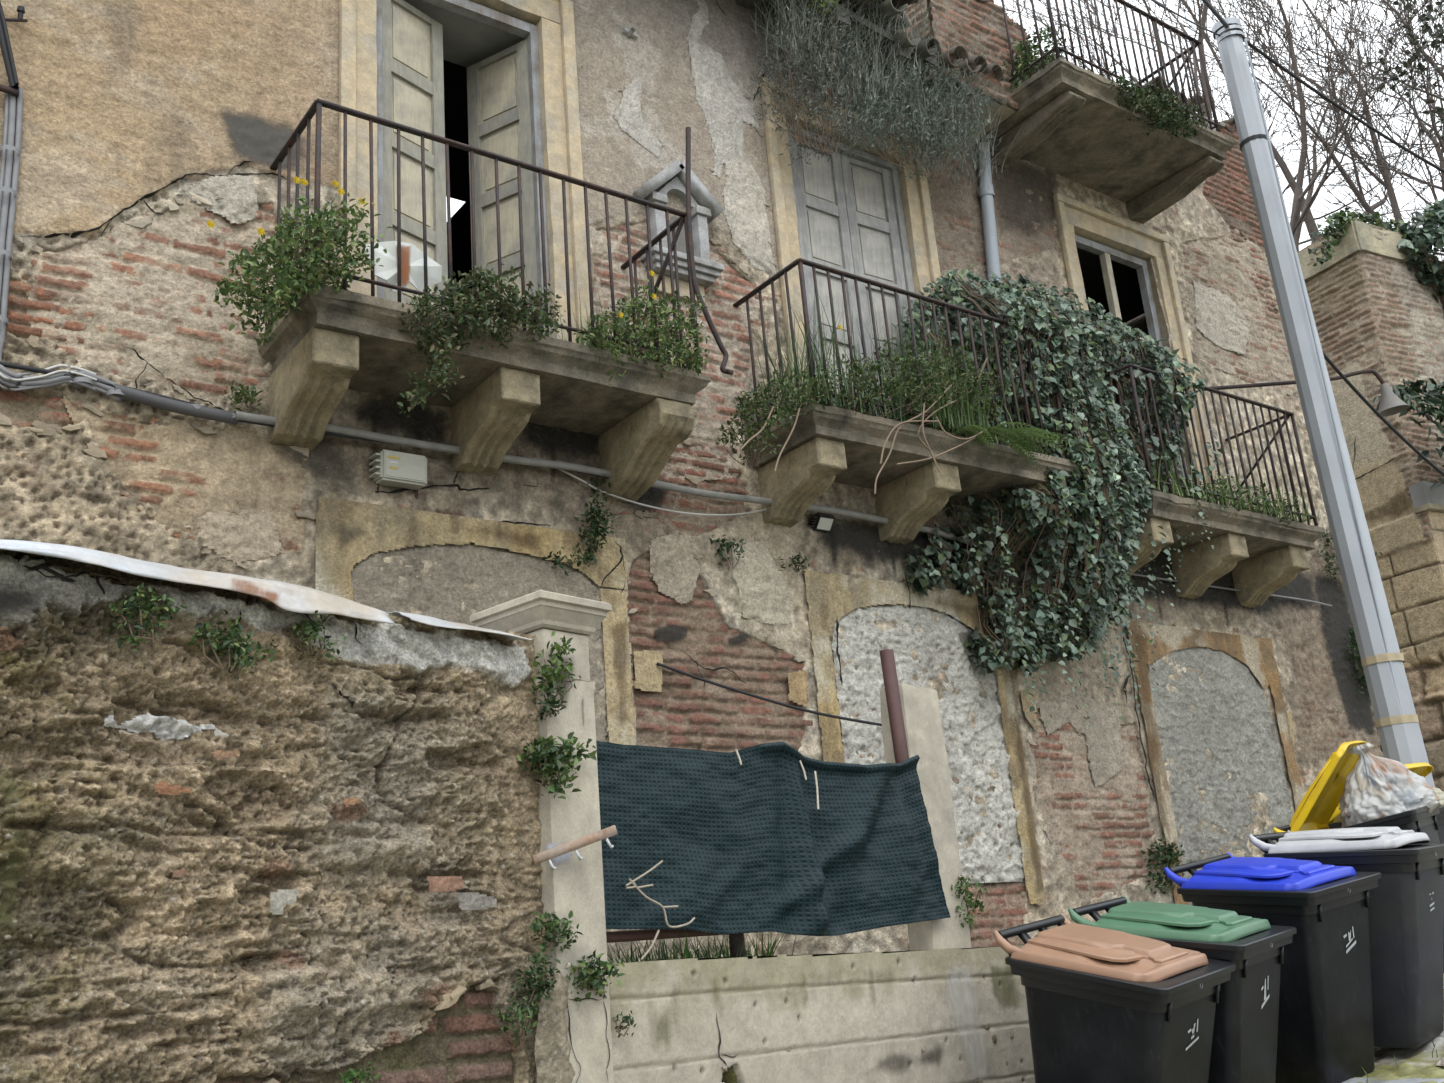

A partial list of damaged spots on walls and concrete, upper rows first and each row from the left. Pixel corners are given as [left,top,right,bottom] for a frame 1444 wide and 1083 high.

crack [23,161,287,238]
spalling [0,175,316,569]
spalling [589,0,813,753]
rust [234,580,278,601]
spalling [1027,691,1161,906]
spalling [215,979,514,1083]
spalling [534,963,576,1083]
crack [716,1014,737,1065]